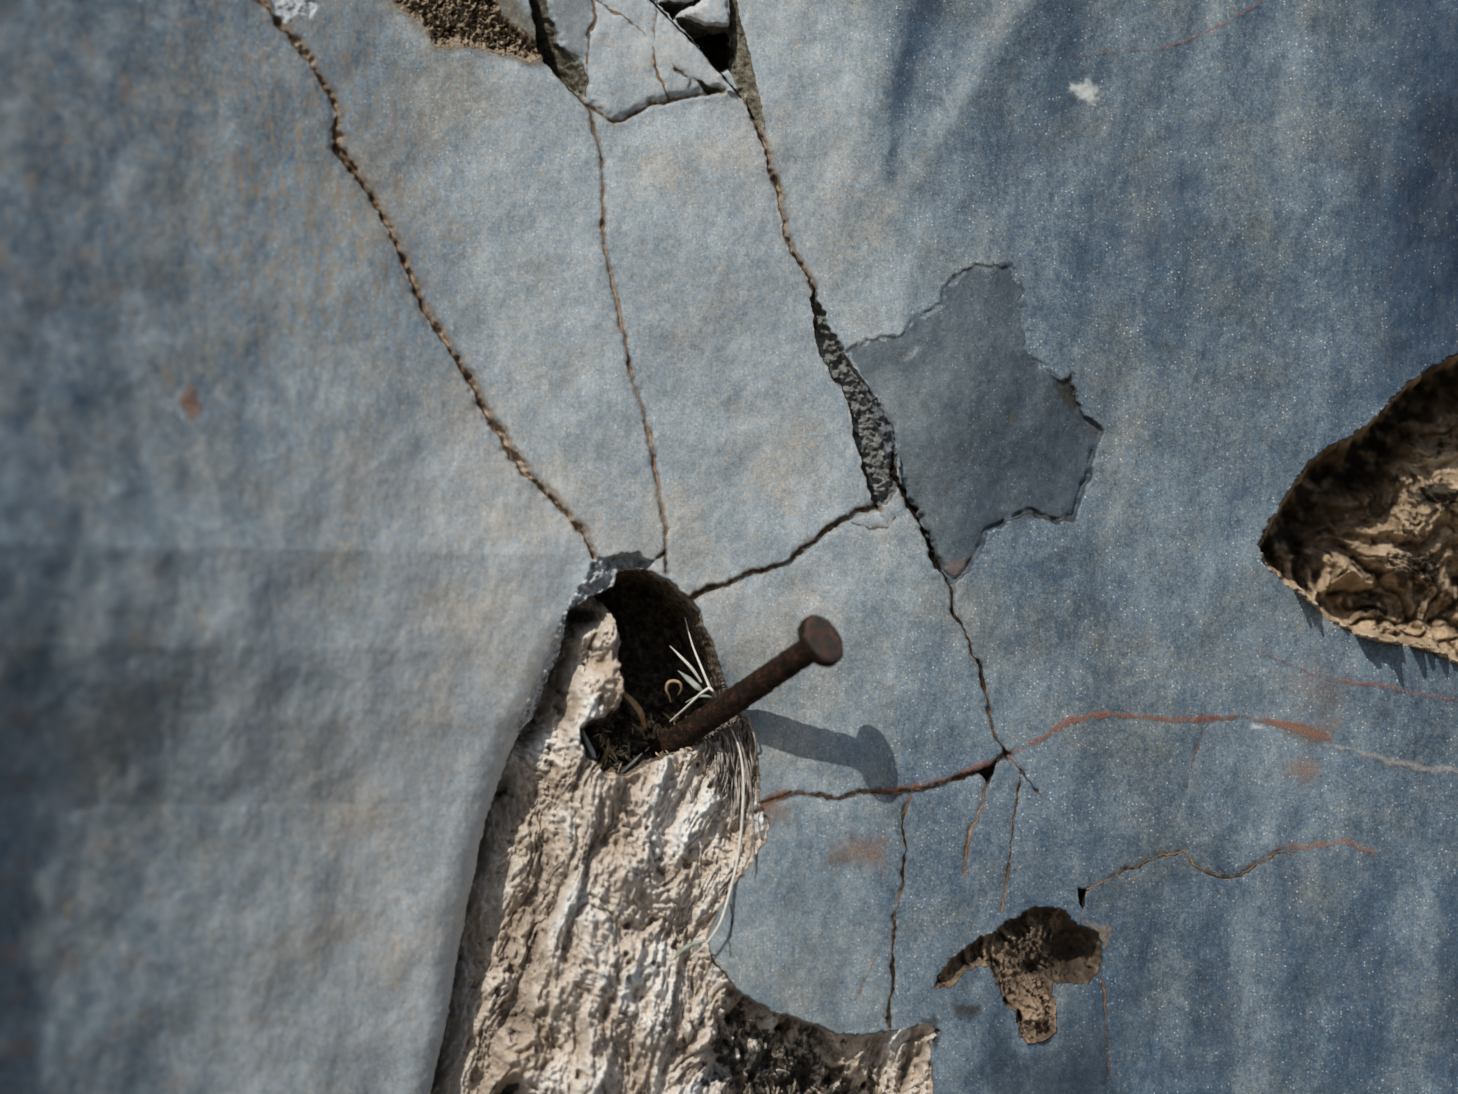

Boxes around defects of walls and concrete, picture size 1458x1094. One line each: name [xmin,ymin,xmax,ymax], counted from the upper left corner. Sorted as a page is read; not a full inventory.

spalling [271,0,319,24]
spalling [392,0,544,66]
crack [258,0,597,560]
crack [529,0,1042,1028]
spalling [811,262,1103,584]
spalling [515,552,652,734]
crack [1078,729,1292,909]
spalling [933,906,1103,1044]